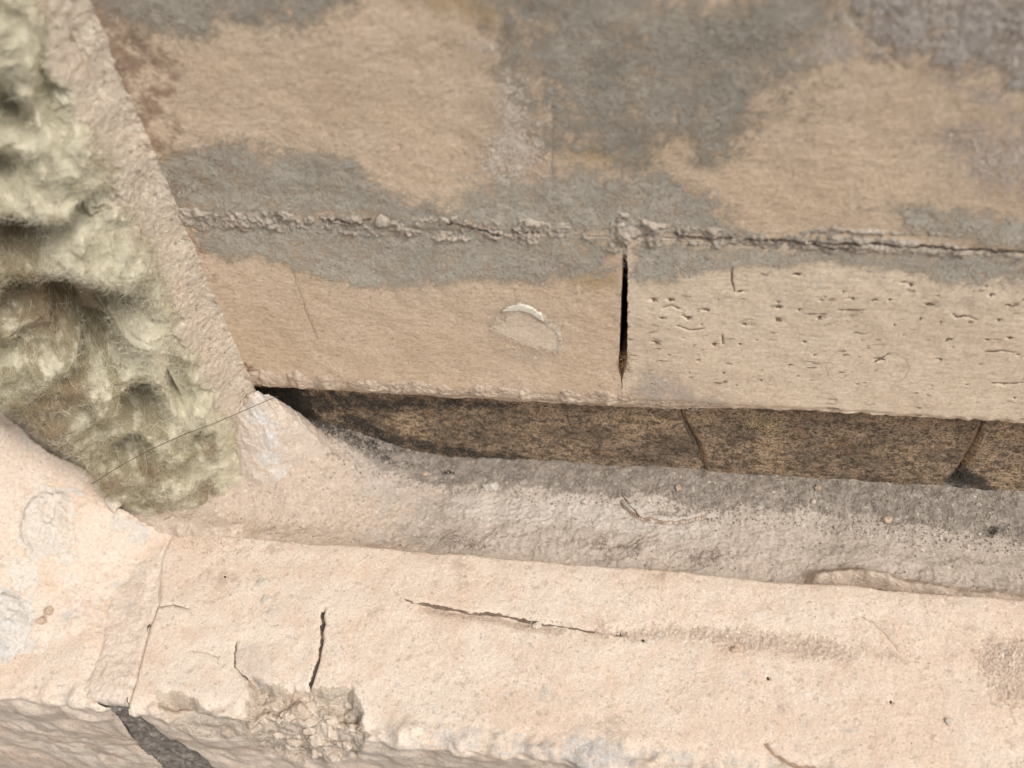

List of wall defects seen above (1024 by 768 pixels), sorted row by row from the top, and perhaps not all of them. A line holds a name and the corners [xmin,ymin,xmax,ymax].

water stain [91,0,383,69]
water stain [157,0,1024,306]
crack [674,233,1024,254]
flaking render [487,299,571,367]
crack [620,259,628,345]
crack [309,611,326,690]
crack [405,599,599,634]
spalling [155,640,371,765]